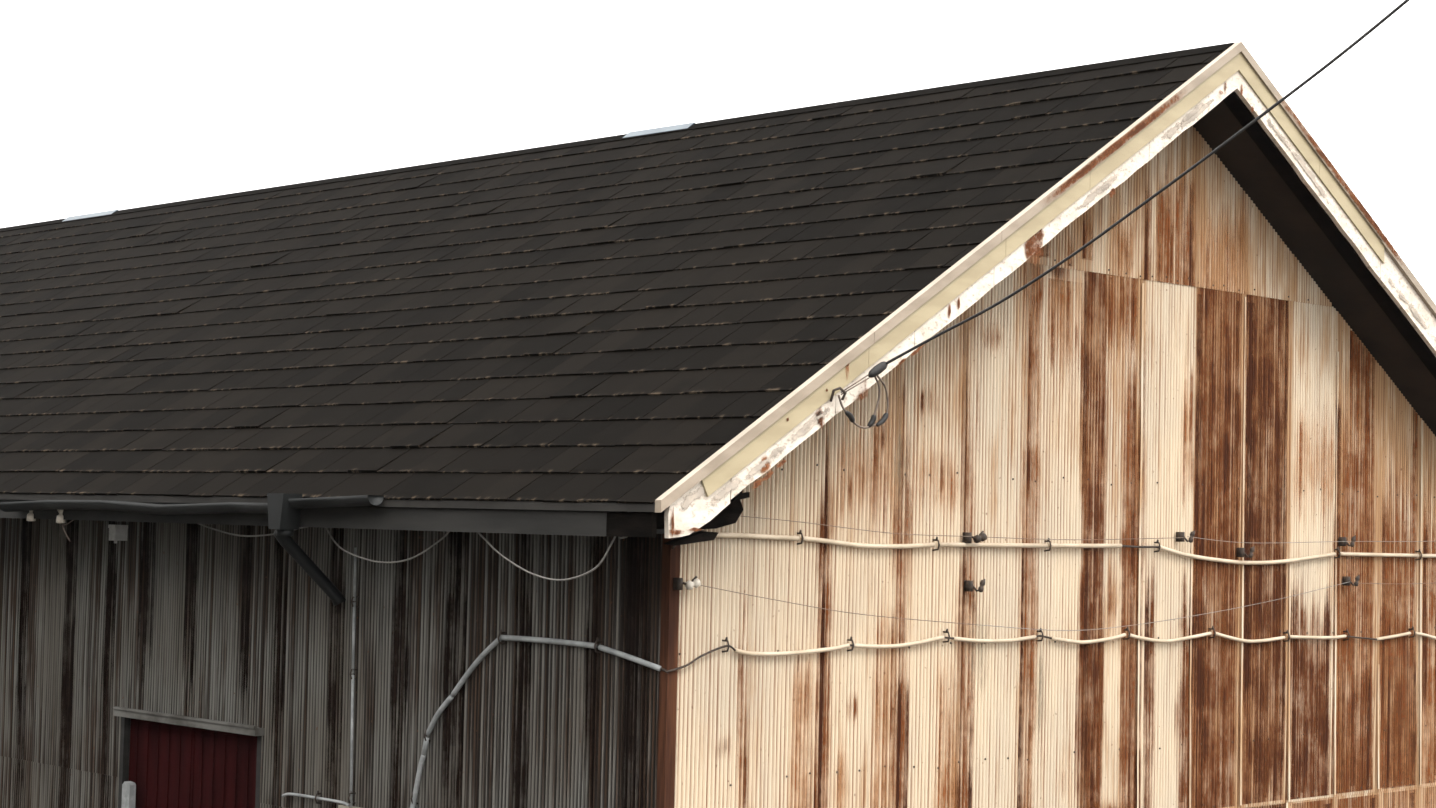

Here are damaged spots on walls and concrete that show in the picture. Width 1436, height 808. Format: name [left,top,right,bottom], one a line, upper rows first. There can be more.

peeling [1389,278,1436,340]
corrosion [753,457,786,488]
corrosion [1017,168,1436,808]
corrosion [930,369,978,711]
corrosion [792,430,923,808]
corrosion [739,717,747,805]
corrosion [937,712,972,808]